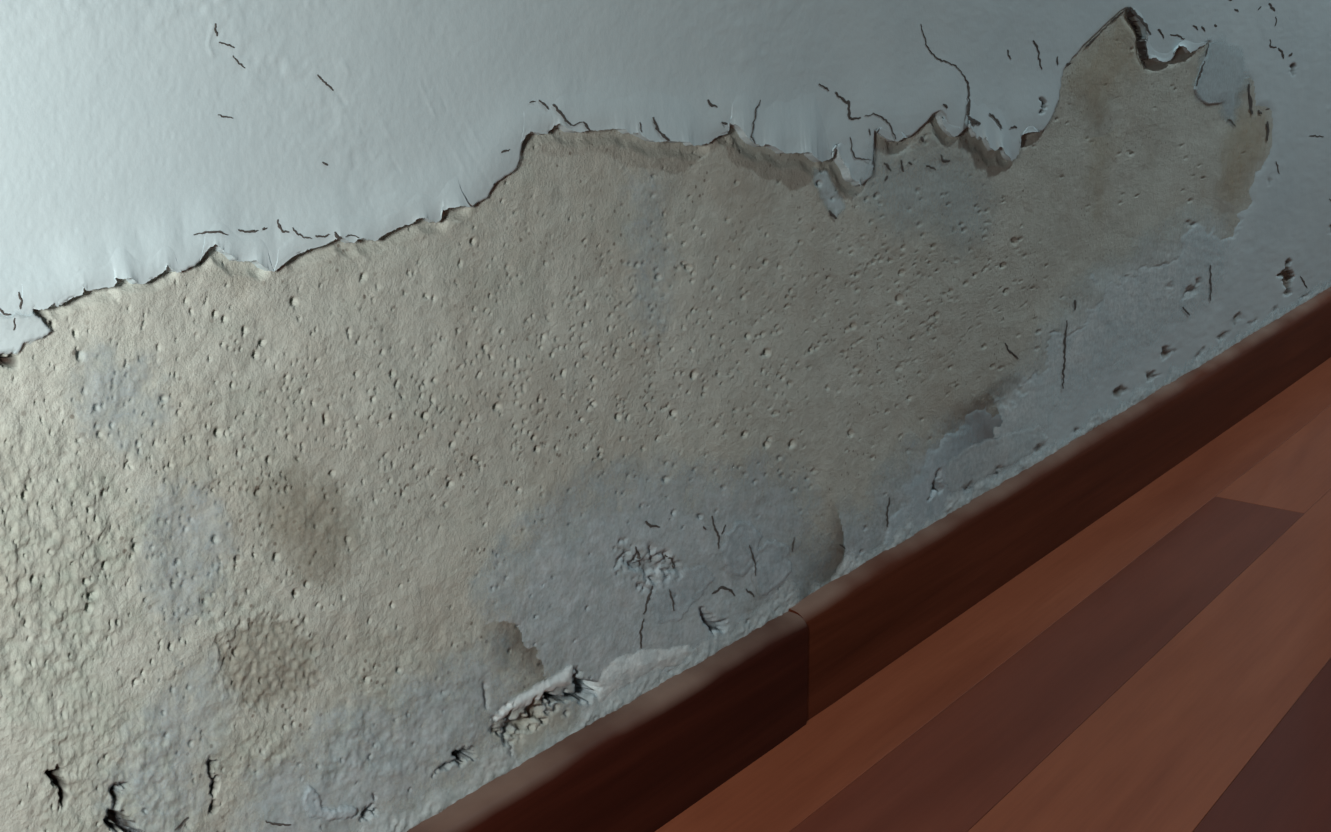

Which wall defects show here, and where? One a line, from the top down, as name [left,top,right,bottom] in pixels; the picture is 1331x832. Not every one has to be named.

crack [921,25,1017,129]
peeling [521,91,728,146]
peeling [728,92,832,162]
peeling [968,96,1021,161]
peeling [273,176,470,272]
peeling [22,245,181,310]
efflorescence [993,217,1220,451]
leakage [840,427,982,568]
efflorescence [490,463,815,708]
flaking render [490,665,574,721]
flaking render [461,750,522,799]
flaking render [363,801,435,832]